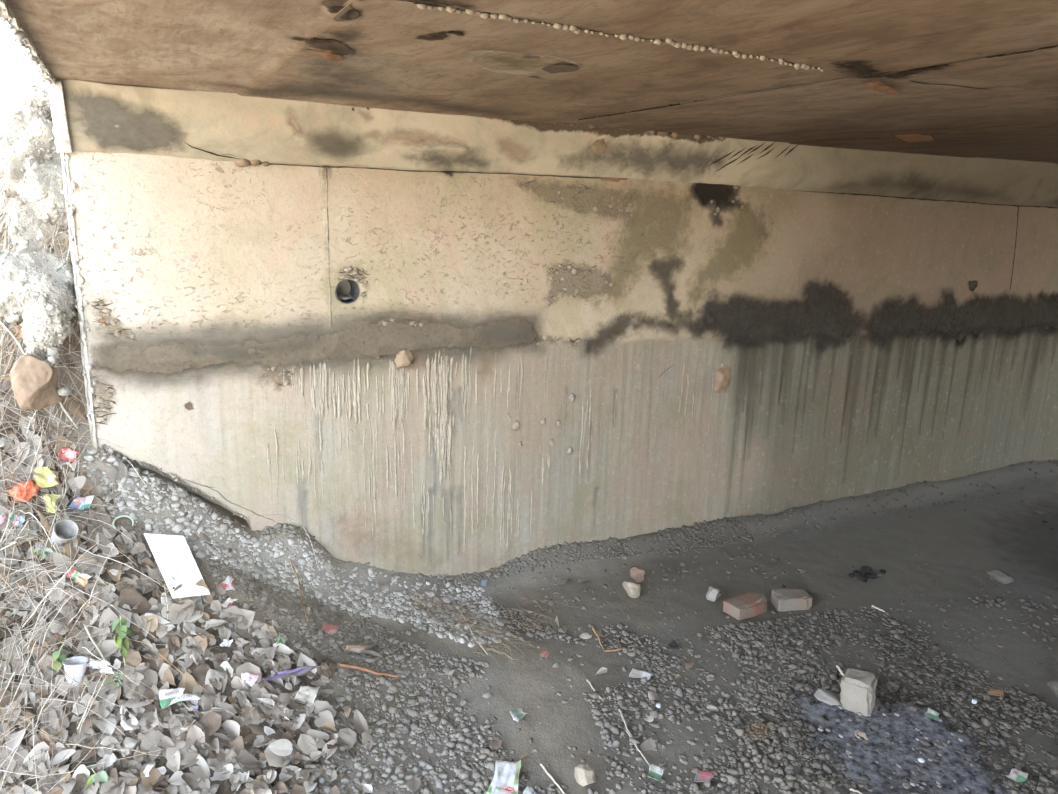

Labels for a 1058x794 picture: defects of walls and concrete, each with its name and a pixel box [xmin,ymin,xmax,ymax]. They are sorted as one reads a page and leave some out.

damp [71,93,182,152]
damp [313,134,359,156]
damp [422,151,487,167]
damp [585,259,1058,353]
damp [269,347,532,555]